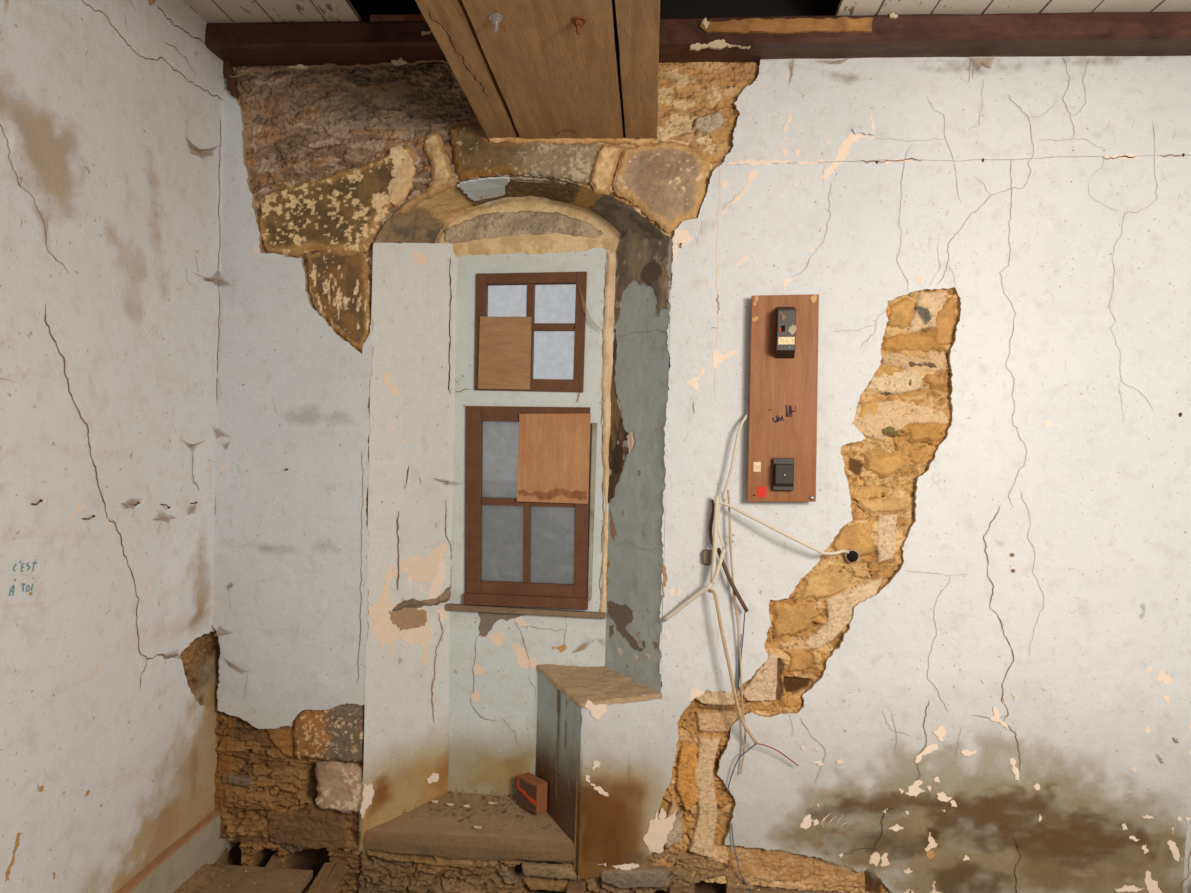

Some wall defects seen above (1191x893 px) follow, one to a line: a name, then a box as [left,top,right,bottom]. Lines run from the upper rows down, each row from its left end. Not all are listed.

crack [0,125,70,274]
crack [44,304,179,688]
crack [82,0,223,397]
spalling [180,631,374,893]
peeling [369,542,451,667]
spalling [232,39,760,541]
peeling [478,612,538,669]
peeling [585,760,609,797]
spalling [598,275,959,893]
crack [723,56,1185,781]
water stain [778,710,1187,893]
crack [1013,837,1023,893]